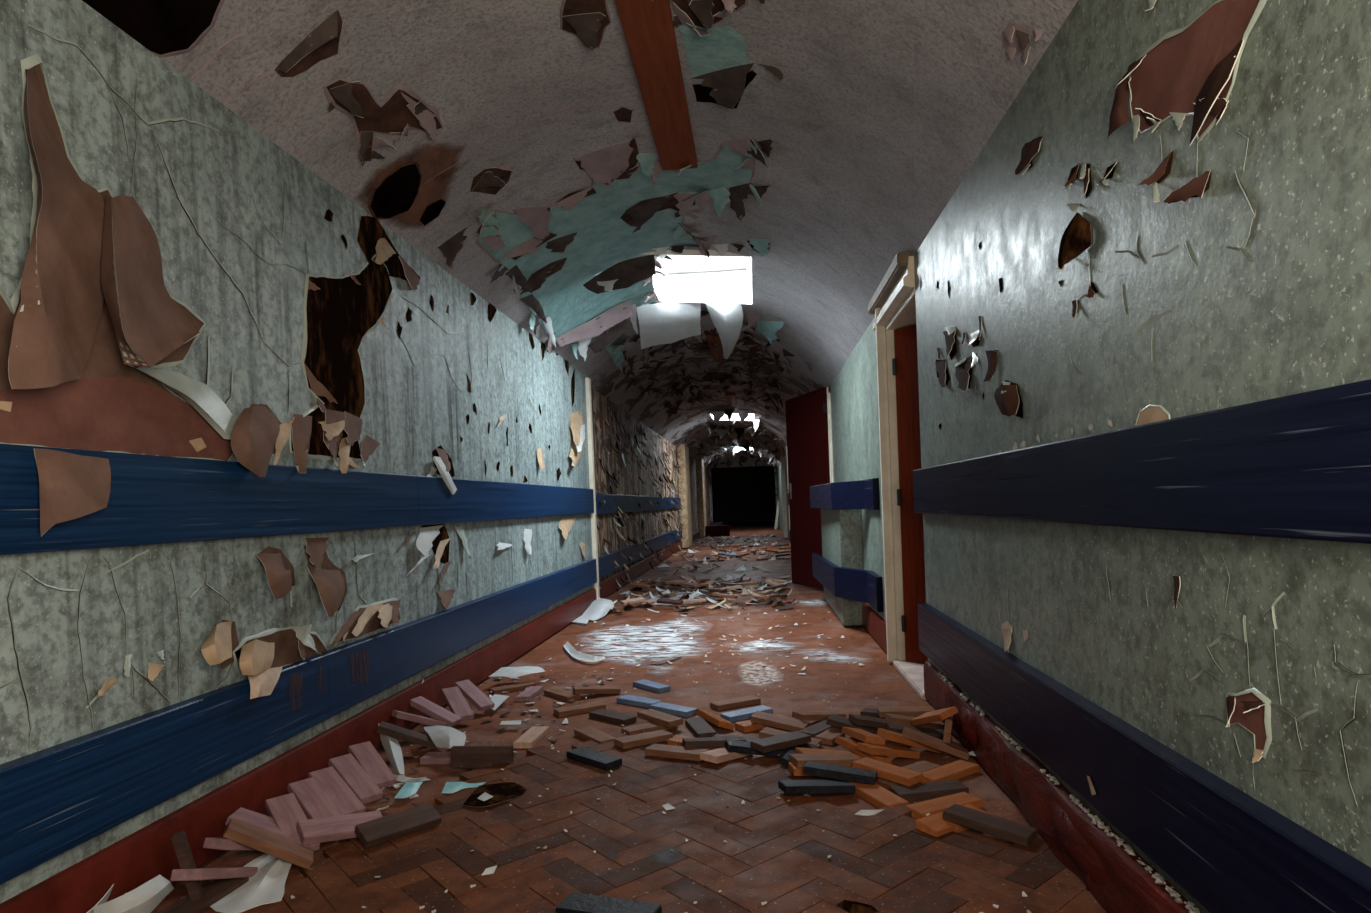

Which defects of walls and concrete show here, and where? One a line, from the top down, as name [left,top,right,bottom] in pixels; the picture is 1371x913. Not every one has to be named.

flaking render [82,0,225,58]
peeling [275,10,342,77]
peeling [1108,0,1267,248]
peeling [0,53,449,537]
peeling [427,108,795,592]
peeling [935,316,1023,418]
peeling [1057,162,1117,318]
crack [0,548,244,749]
peeling [201,537,401,699]
crack [1146,574,1183,608]
crack [1208,553,1295,651]
crack [1334,644,1371,806]